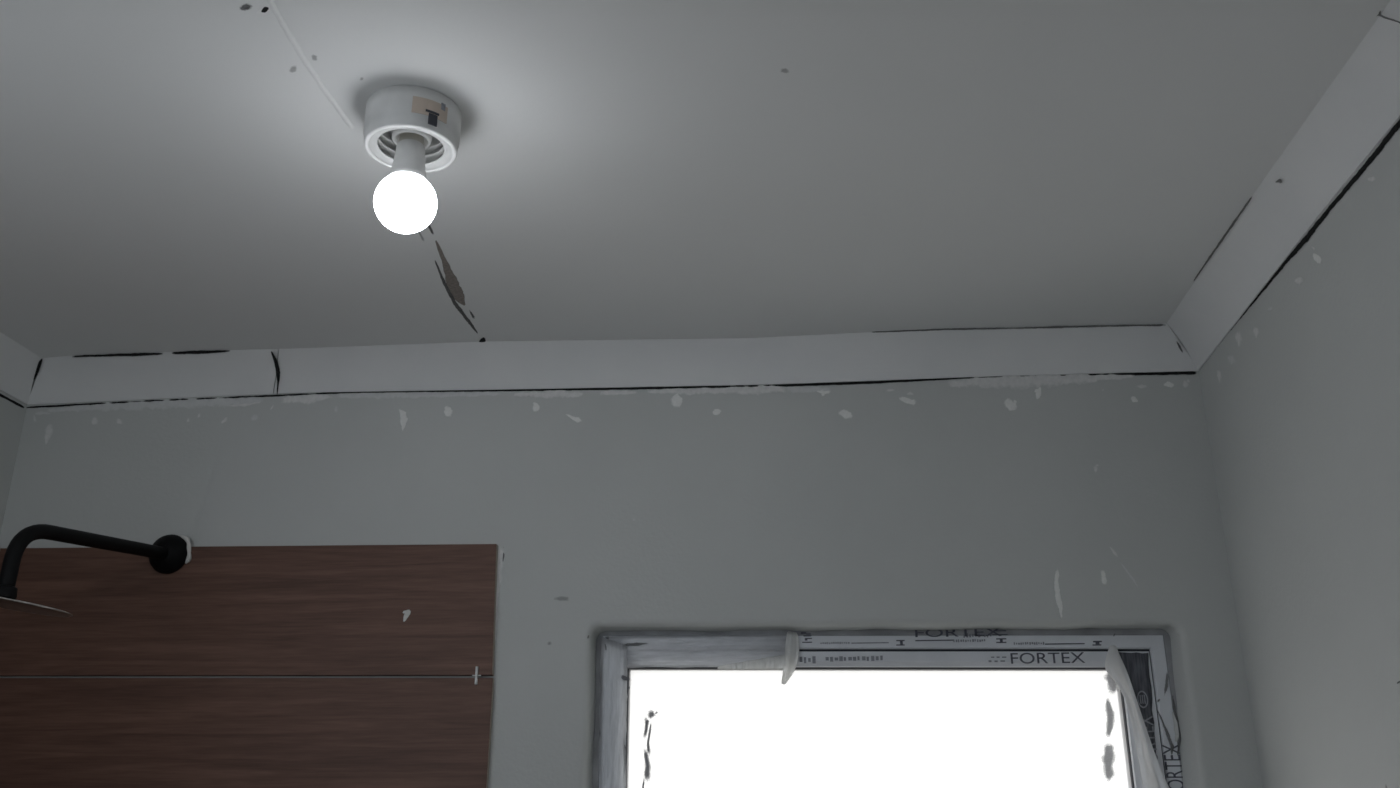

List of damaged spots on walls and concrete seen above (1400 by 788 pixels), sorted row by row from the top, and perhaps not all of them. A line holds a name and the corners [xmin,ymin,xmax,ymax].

crack [1194,197,1252,281]
crack [428,225,486,342]
crack [0,350,1003,408]